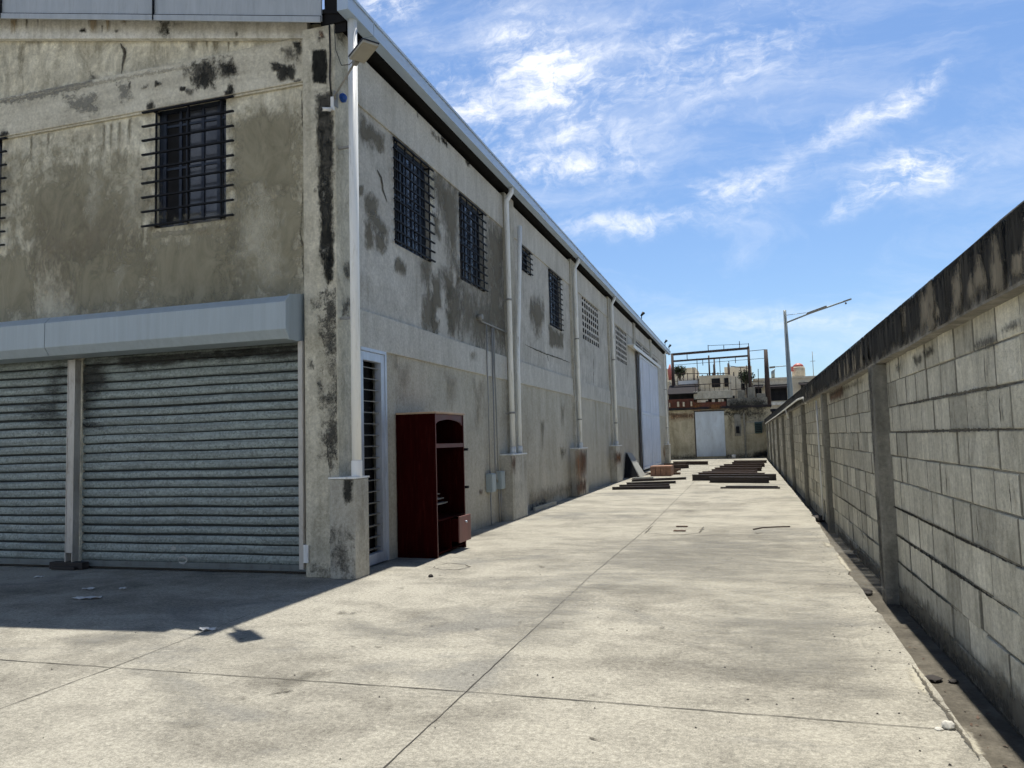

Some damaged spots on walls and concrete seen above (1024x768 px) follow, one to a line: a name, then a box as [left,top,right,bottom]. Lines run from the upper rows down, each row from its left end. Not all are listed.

leakage [179,42,236,95]
leakage [360,117,384,153]
leakage [271,31,350,469]
leakage [359,186,387,254]
leakage [421,172,505,355]
leakage [724,202,1024,453]
leakage [343,480,353,502]